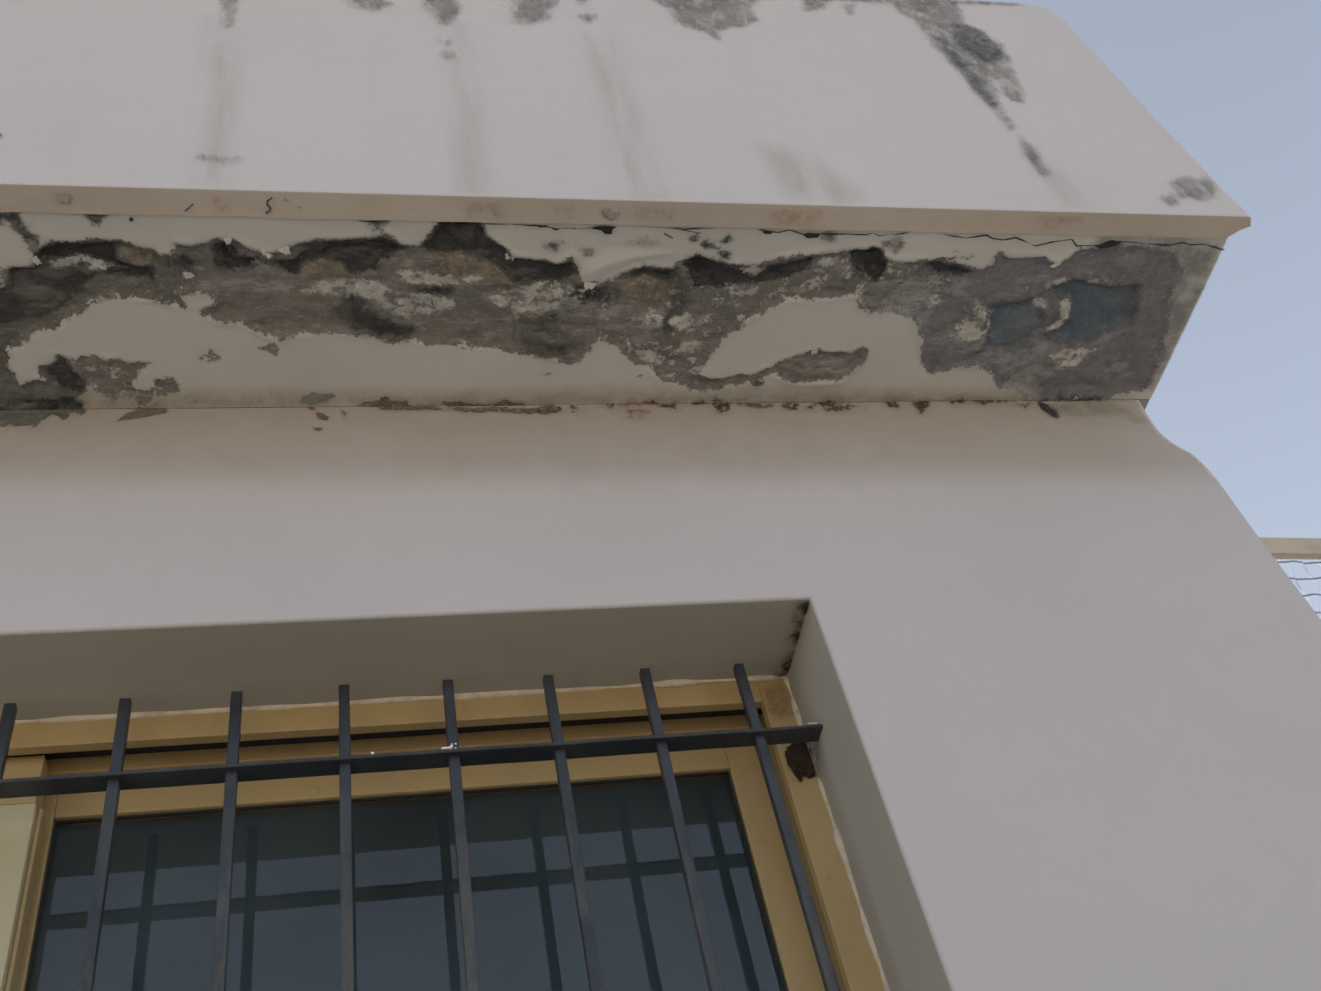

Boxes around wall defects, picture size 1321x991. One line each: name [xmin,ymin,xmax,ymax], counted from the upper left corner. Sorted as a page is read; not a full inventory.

damp [660,0,758,37]
damp [867,0,1021,106]
damp [1024,142,1049,174]
crack [436,222,616,234]
crack [663,228,716,239]
crack [757,229,907,238]
crack [944,234,1224,250]
spalling [0,212,1211,430]